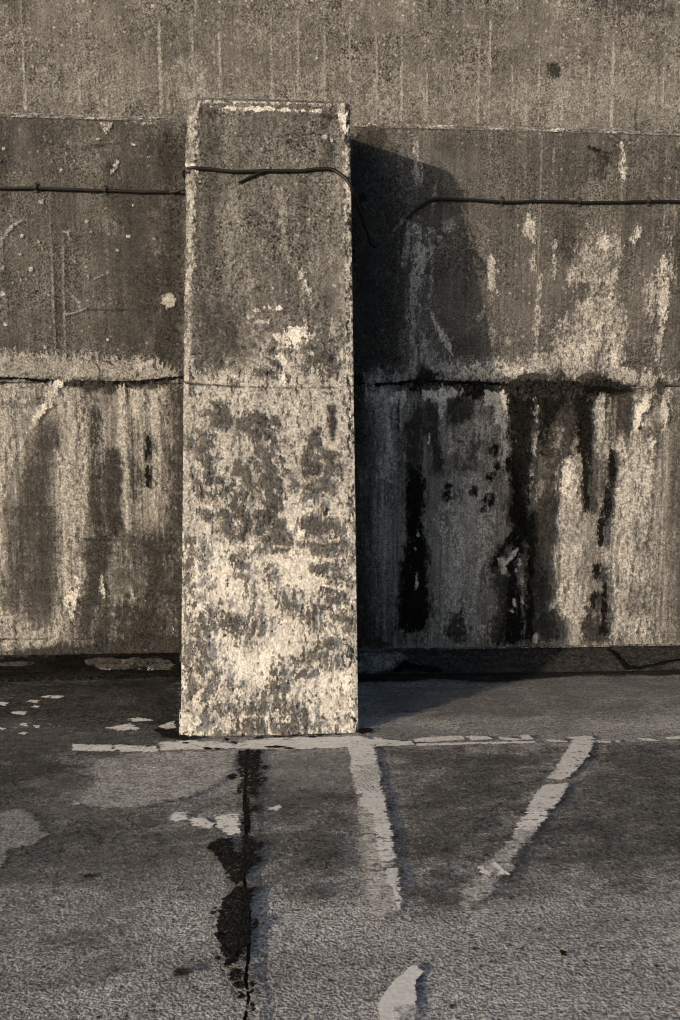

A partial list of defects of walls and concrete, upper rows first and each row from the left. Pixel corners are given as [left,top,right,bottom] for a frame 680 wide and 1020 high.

crack [182,733,342,1020]
leakage [0,125,680,926]